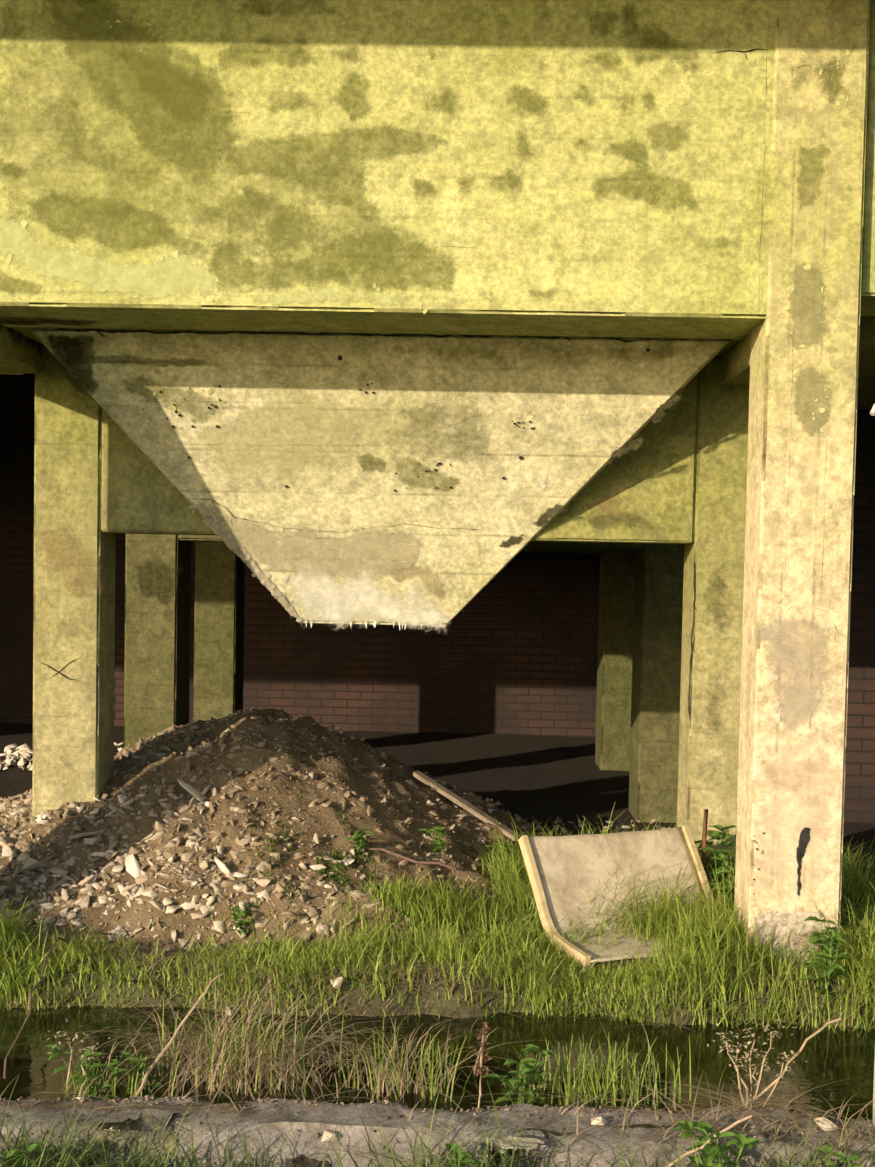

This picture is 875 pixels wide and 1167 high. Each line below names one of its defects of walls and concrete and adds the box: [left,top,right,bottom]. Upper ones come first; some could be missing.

damp [591,6,689,62]
damp [513,88,546,112]
crack [712,48,809,118]
damp [229,76,435,205]
damp [612,143,664,200]
damp [0,317,203,393]
damp [796,827,811,895]